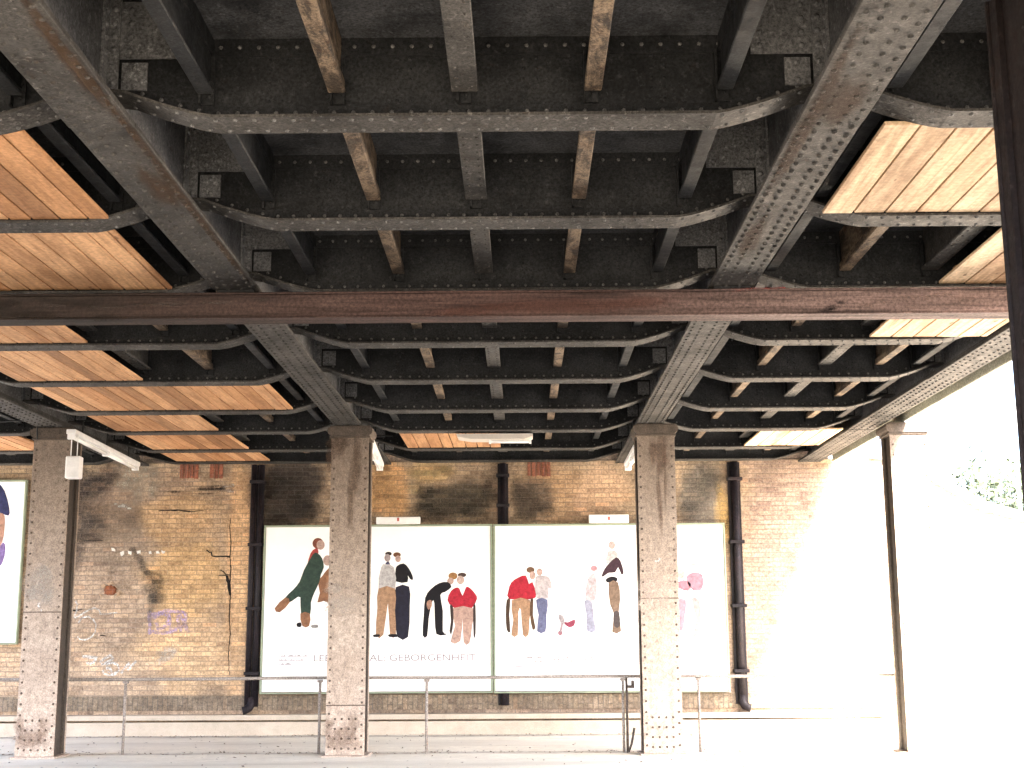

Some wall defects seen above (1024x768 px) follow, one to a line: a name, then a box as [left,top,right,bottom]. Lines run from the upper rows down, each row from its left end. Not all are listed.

water stain [130,549,164,615]
crack [206,518,232,673]